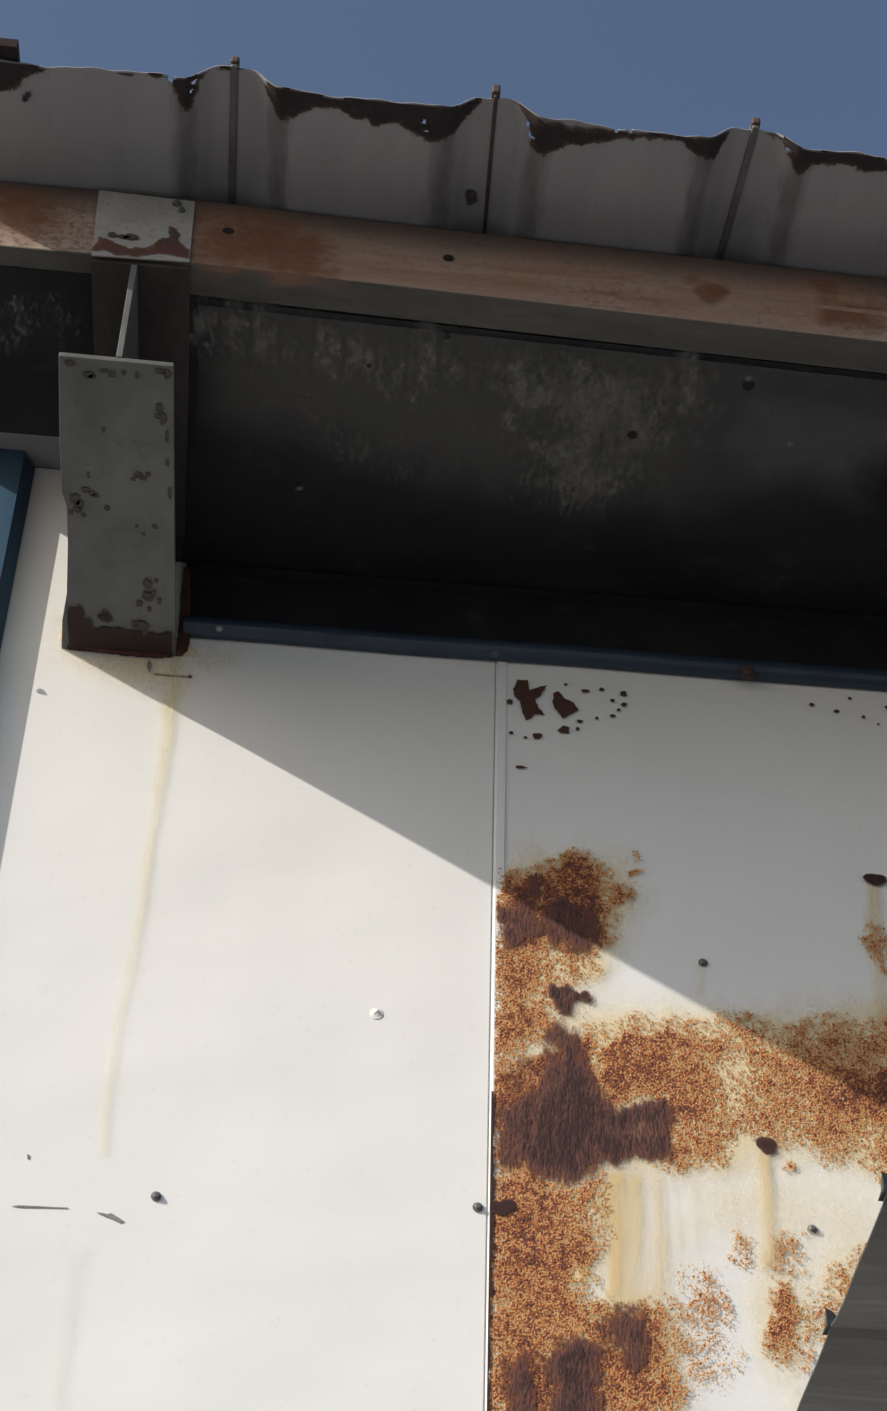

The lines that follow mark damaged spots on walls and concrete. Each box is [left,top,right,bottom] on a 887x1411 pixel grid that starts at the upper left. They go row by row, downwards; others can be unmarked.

corrosion [0,62,46,102]
corrosion [264,81,482,143]
corrosion [518,103,730,160]
corrosion [767,133,887,174]
corrosion [92,226,190,258]
corrosion [59,567,196,678]
corrosion [487,846,887,1411]